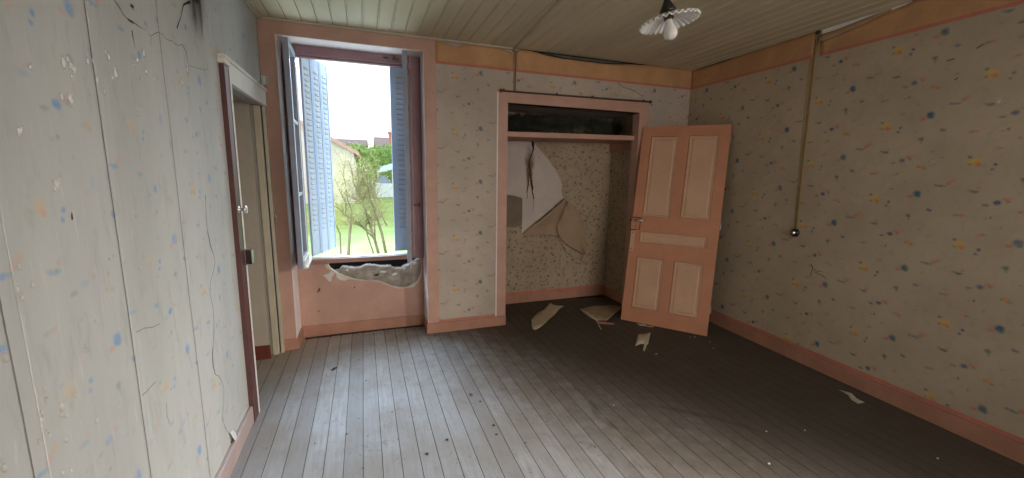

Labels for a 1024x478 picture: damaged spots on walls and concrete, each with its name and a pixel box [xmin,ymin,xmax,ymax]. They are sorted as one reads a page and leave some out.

crack [114,0,207,75]
peeling [506,141,563,233]
flaking render [317,258,422,292]